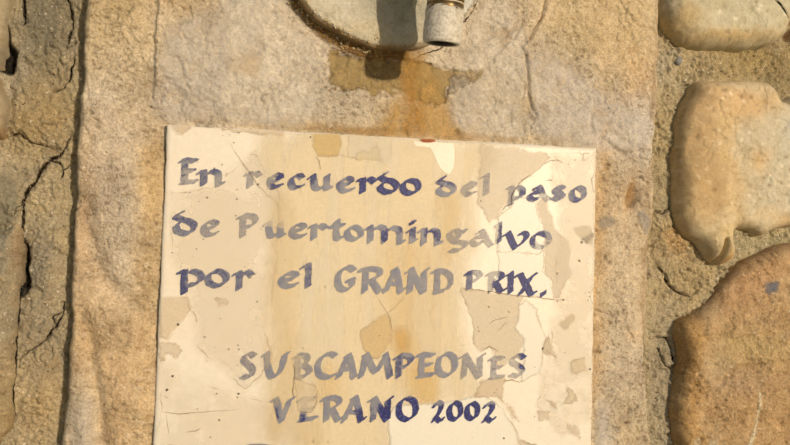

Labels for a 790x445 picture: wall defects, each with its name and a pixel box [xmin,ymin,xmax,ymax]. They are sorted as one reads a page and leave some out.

crack [9,133,71,228]
peeling [314,134,349,157]
crack [12,259,65,416]
water stain [265,134,474,445]
peeling [360,315,391,359]
peeling [460,197,566,382]
peeling [388,377,530,445]